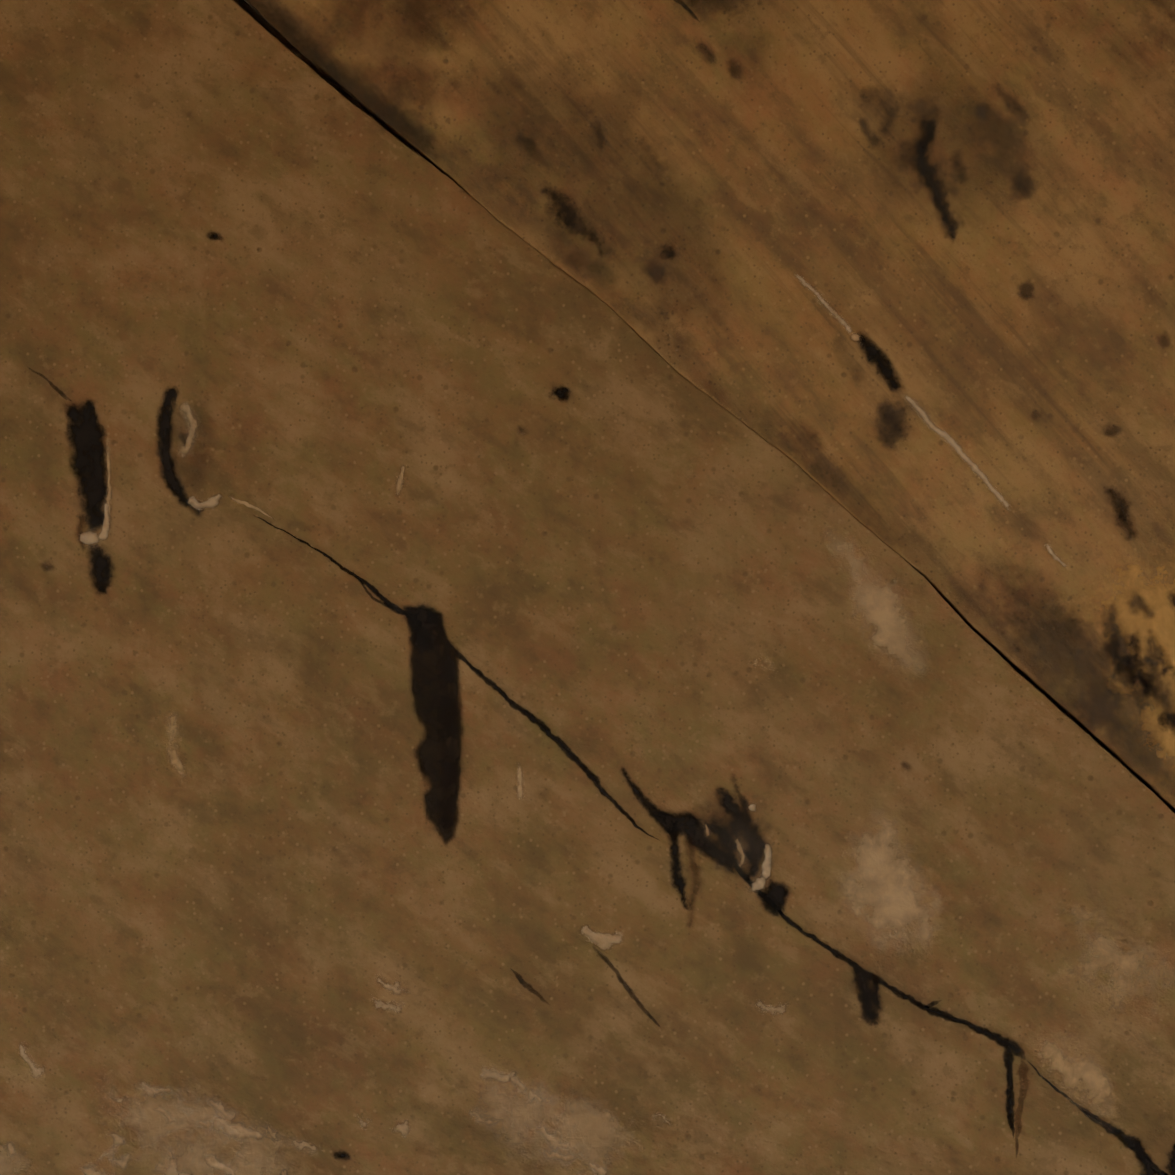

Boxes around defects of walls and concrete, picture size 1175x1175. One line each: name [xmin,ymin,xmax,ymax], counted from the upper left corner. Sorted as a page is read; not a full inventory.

crack [676,0,737,74]
crack [36,372,67,398]
spalling [66,400,113,593]
crack [257,517,406,615]
peeling [1102,565,1175,757]
crack [448,641,659,840]
spalling [621,768,789,916]